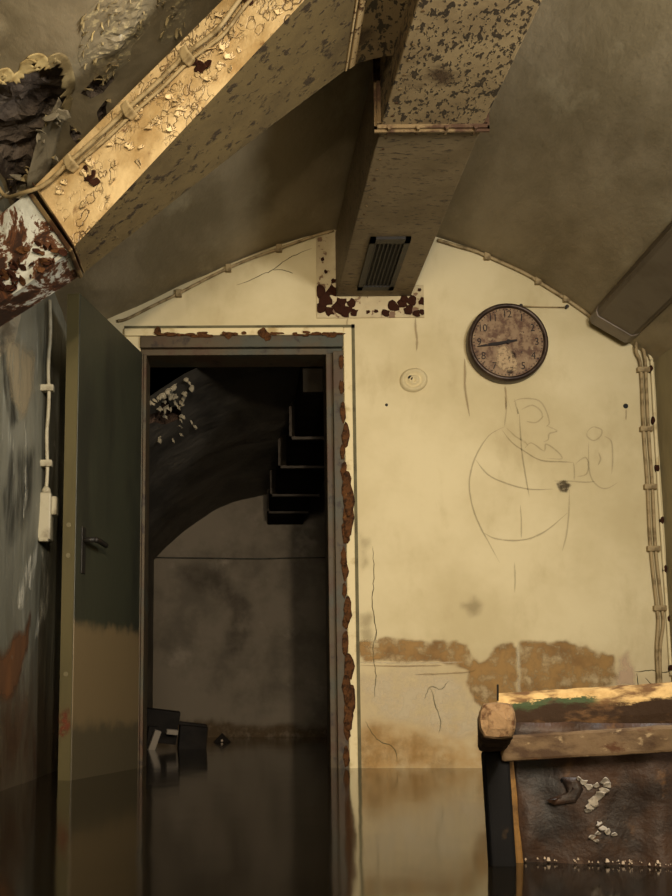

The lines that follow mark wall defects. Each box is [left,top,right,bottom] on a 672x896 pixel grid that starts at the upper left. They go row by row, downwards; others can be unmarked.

peeling [0,0,157,214]
corrosion [0,240,68,293]
corrosion [317,257,424,317]
spalling [0,314,21,356]
corrosion [154,326,246,340]
corrosion [257,327,346,341]
leakage [0,334,34,423]
peeling [150,378,197,444]
leakage [8,455,33,533]
corrosion [339,380,355,767]
crack [425,681,449,731]